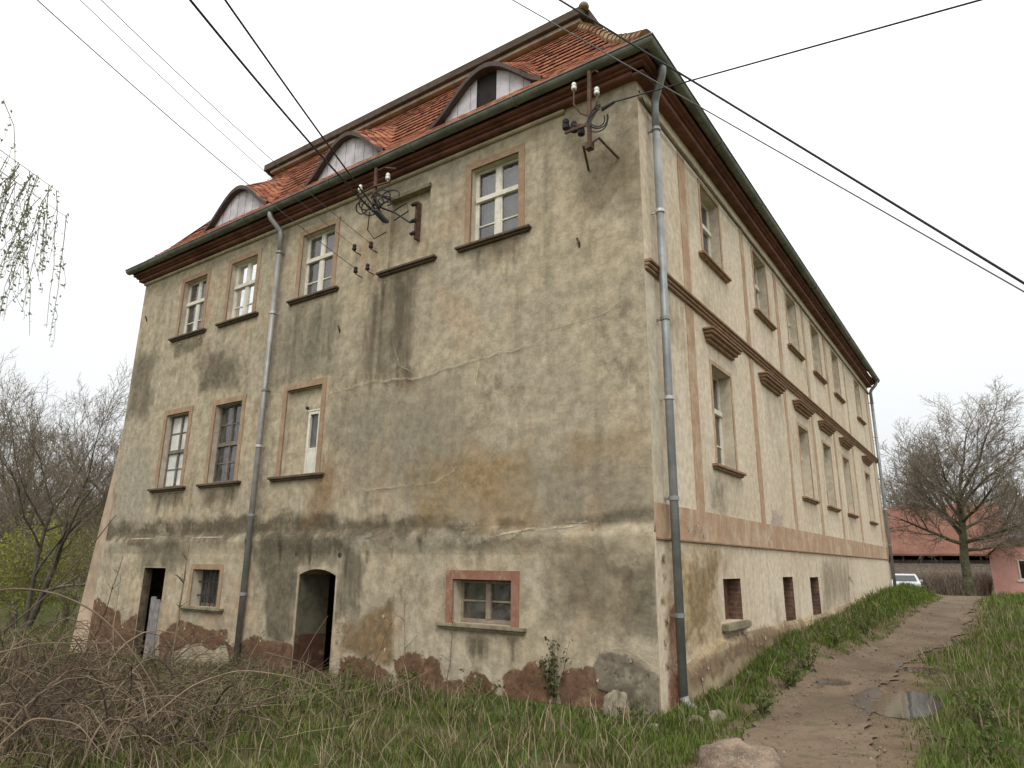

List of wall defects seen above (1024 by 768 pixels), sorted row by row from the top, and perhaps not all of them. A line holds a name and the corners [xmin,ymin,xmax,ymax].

damp [367,276,412,381]
damp [128,359,153,415]
damp [200,352,236,390]
damp [106,401,537,646]
crack [500,521,586,540]
damp [552,476,652,527]
peeling [86,598,137,658]
peeling [158,620,292,674]
flaking render [338,601,607,709]
damp [669,553,719,647]